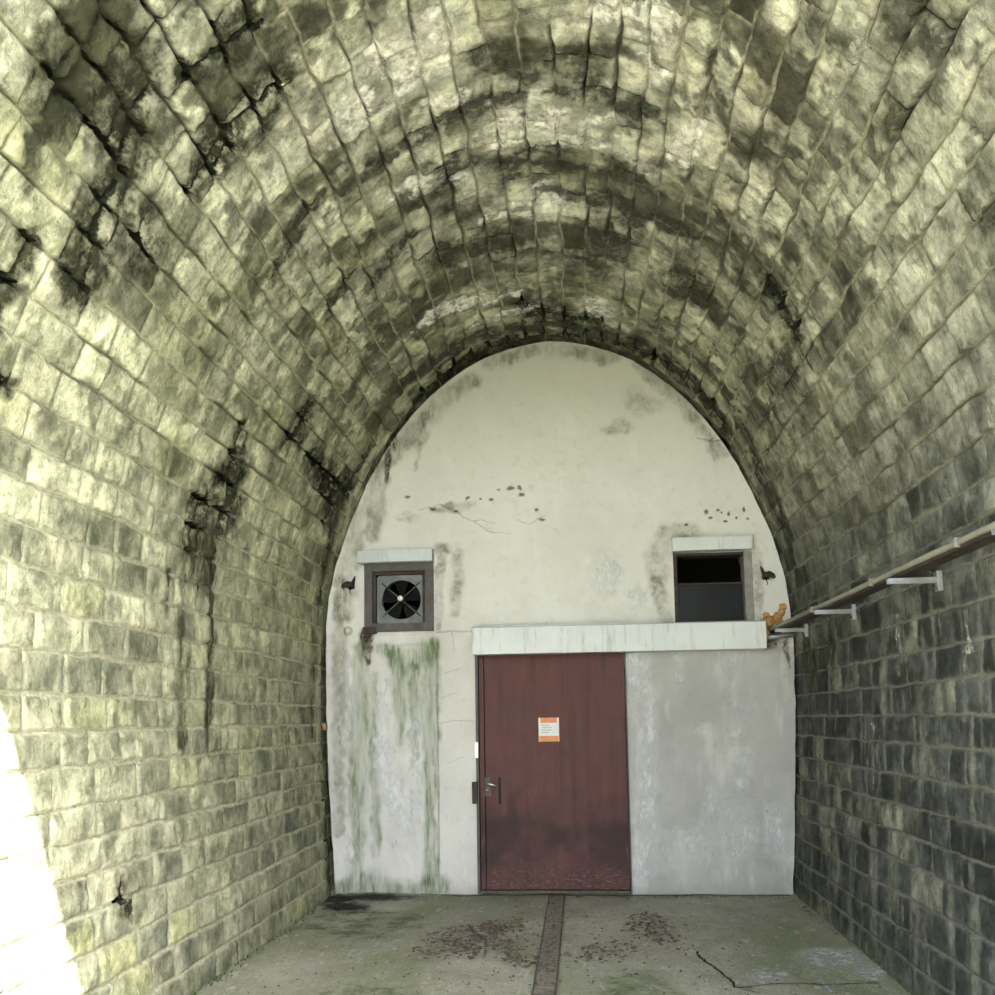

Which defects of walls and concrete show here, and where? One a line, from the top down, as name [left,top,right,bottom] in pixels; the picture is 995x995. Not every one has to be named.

crack [0,0,295,334]
crack [759,271,804,341]
crack [0,373,18,398]
crack [280,396,354,530]
rust [360,633,373,665]
leakage [363,714,415,842]
crack [696,951,884,993]